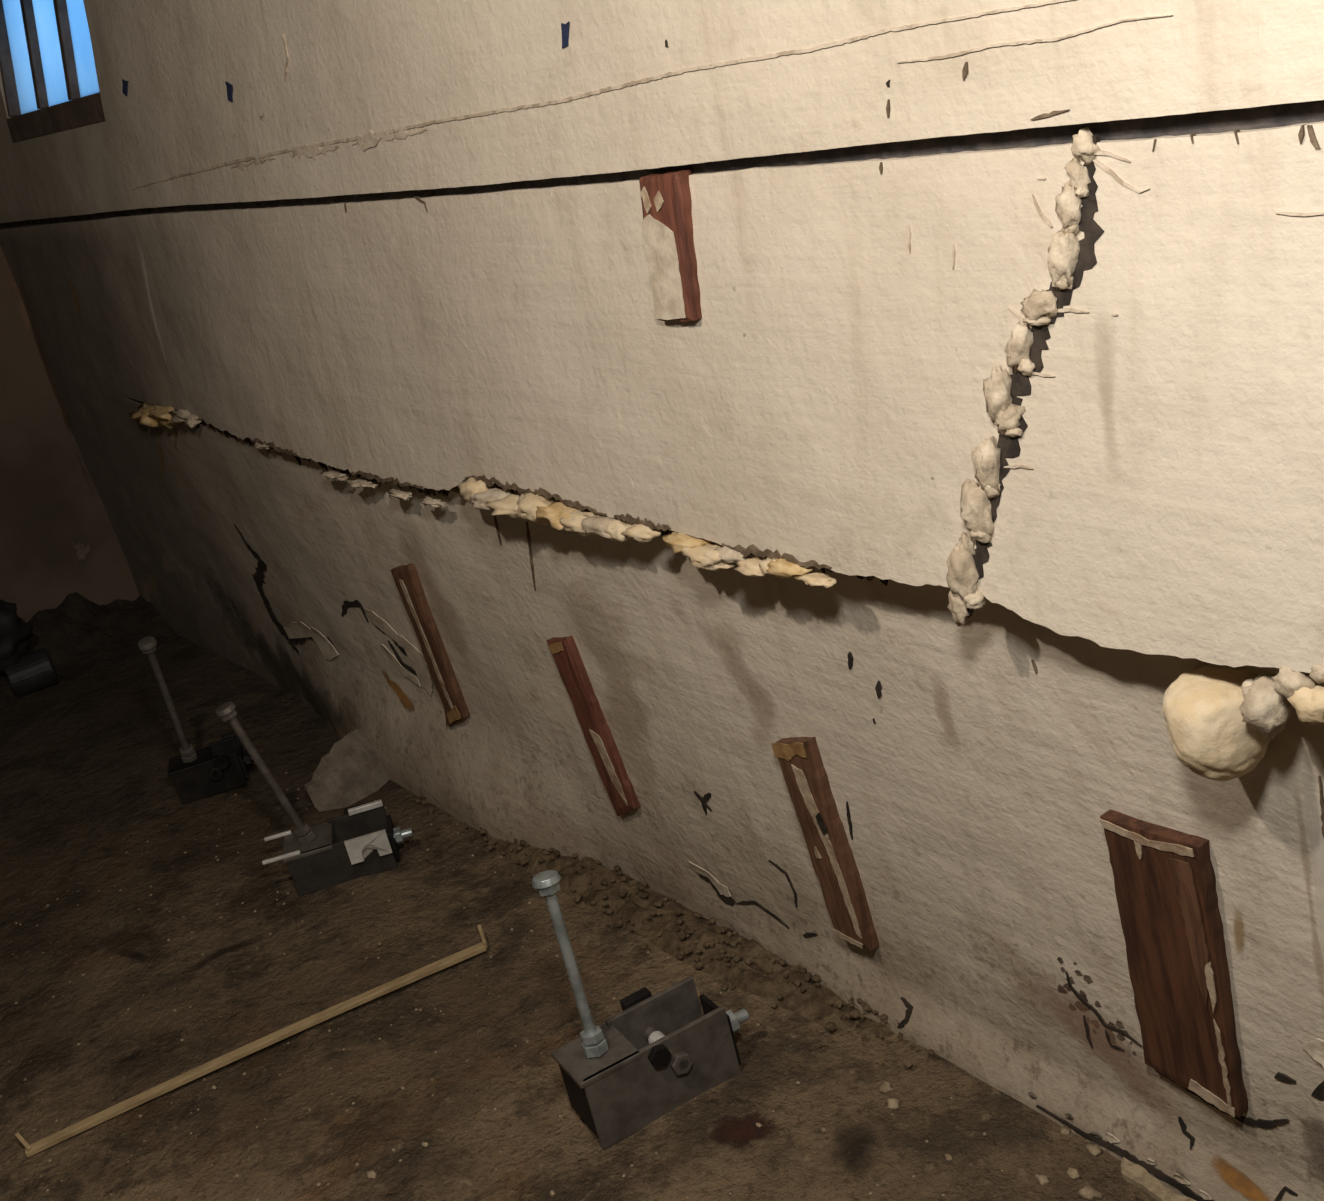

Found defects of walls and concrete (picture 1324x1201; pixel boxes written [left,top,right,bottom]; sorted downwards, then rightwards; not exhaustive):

crack [0,0,1324,626]
crack [234,524,299,655]
crack [694,791,712,815]
crack [768,860,818,938]
crack [1028,957,1289,1201]
crack [1274,1072,1296,1083]
crack [1274,1186,1298,1201]